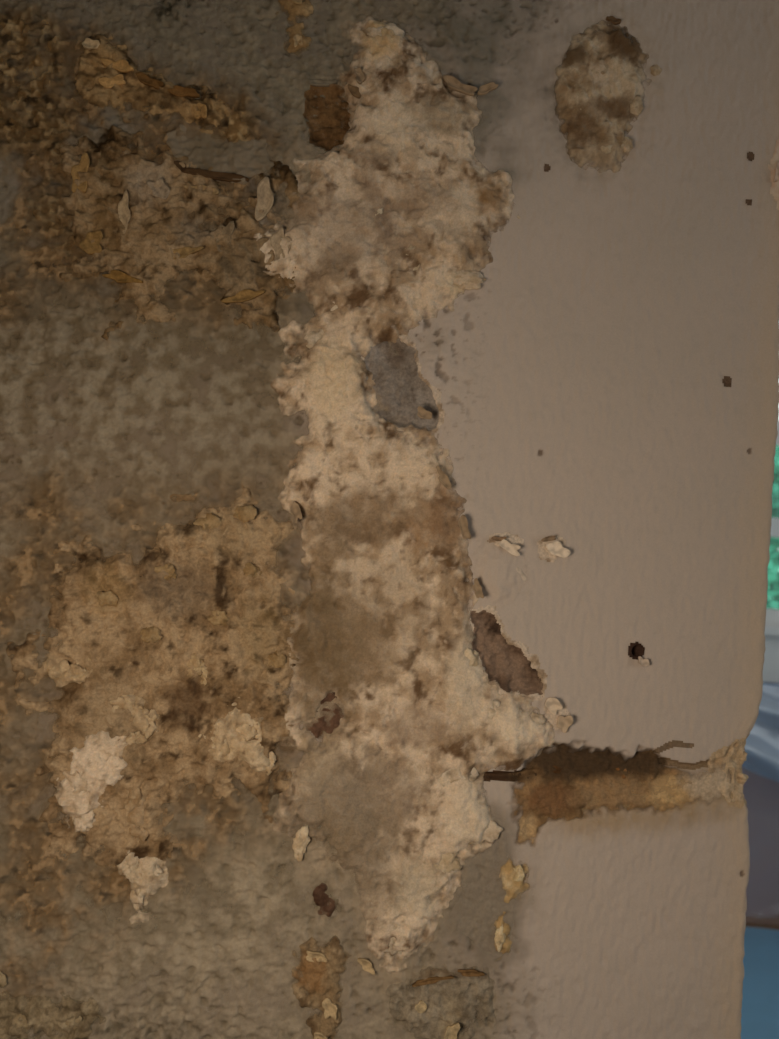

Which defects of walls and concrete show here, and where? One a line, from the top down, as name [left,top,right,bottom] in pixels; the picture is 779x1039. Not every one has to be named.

spalling [303,80,361,151]
flaking render [53,34,300,341]
spalling [360,334,445,434]
leakage [0,0,562,1039]
peeling [487,532,524,556]
peeling [537,535,571,563]
spalling [6,484,344,867]
spalling [468,605,750,845]
spalling [313,883,338,917]
flaking render [494,859,530,961]
flaking render [291,935,375,1039]
flaking render [386,966,496,1039]